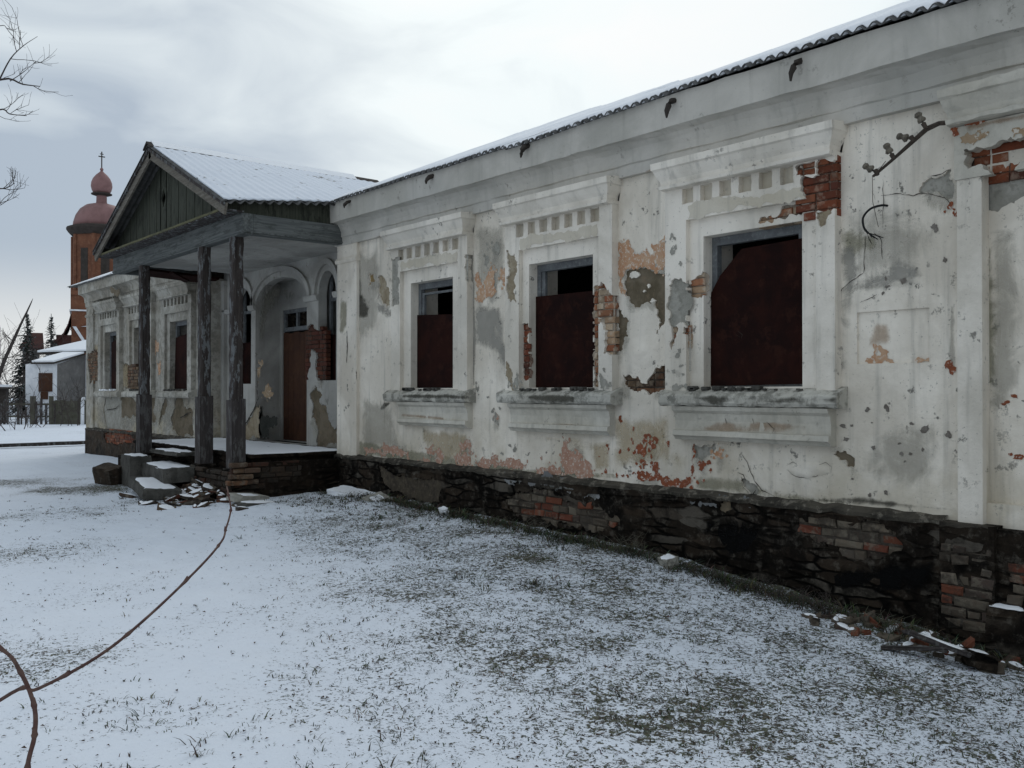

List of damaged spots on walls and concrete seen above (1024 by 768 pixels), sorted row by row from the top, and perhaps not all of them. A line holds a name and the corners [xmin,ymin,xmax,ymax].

flaking render [759,155,841,230]
flaking render [950,120,1024,212]
peeling [466,239,517,303]
flaking render [592,233,710,394]
flaking render [152,398,194,437]
flaking render [305,324,337,447]
flaking render [506,324,533,391]
flaking render [363,415,732,533]
flaking render [835,424,855,480]